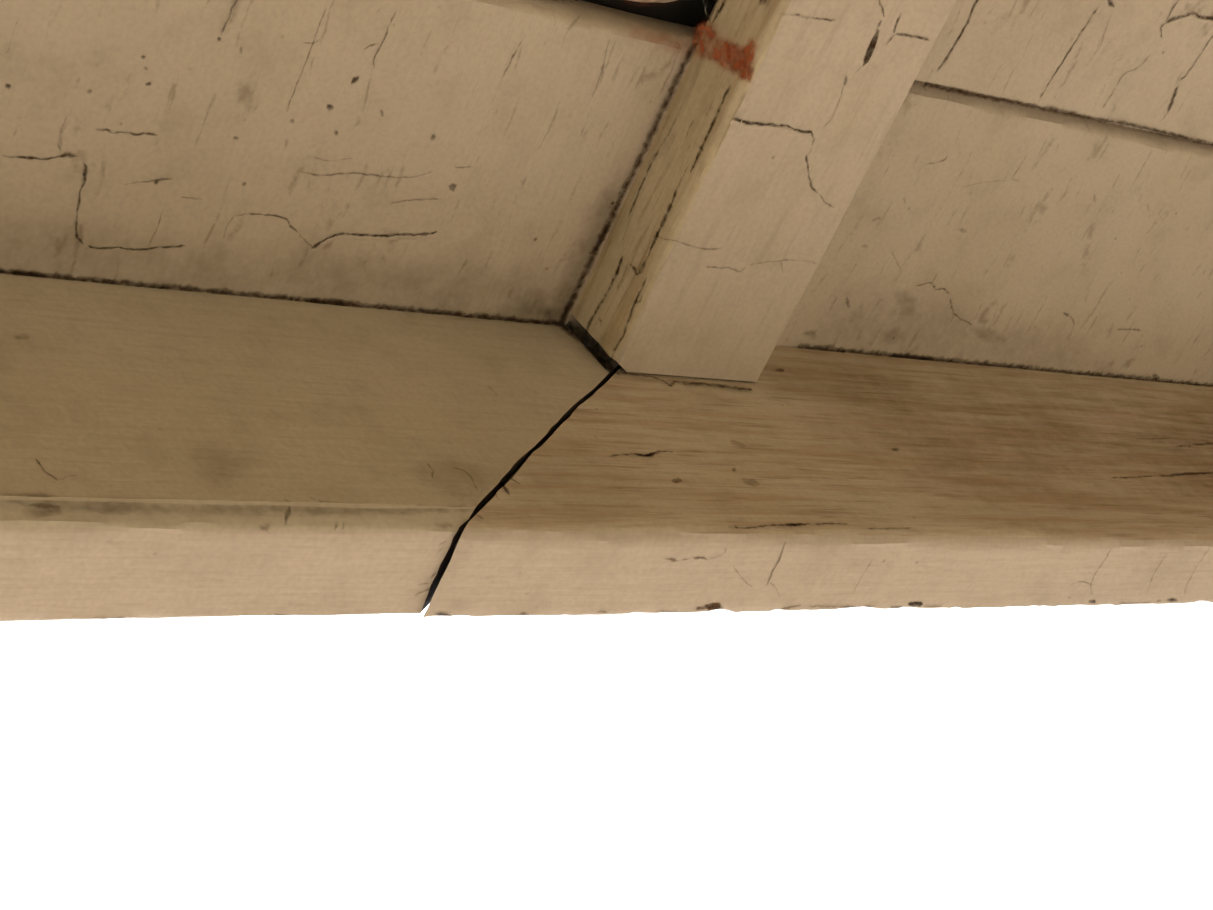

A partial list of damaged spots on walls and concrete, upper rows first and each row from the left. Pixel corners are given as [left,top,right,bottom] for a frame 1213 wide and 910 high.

corrosion [692,25,754,81]
crack [864,0,979,69]
crack [1048,0,1114,84]
crack [1161,4,1213,110]
crack [18,154,183,250]
crack [261,214,437,252]
crack [586,88,815,351]